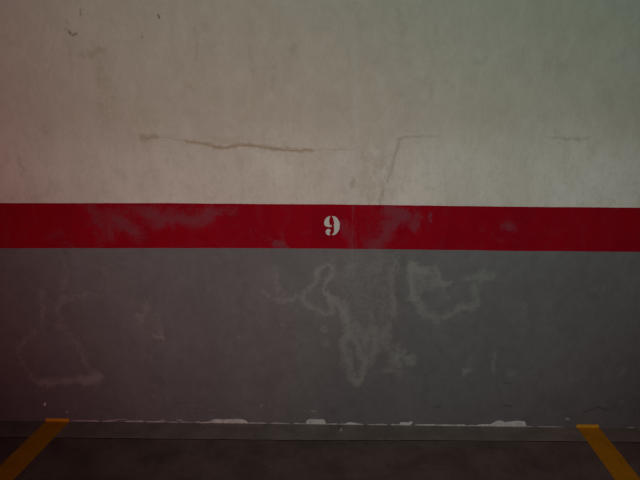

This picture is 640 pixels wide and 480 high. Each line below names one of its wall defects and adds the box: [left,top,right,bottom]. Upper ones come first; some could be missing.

crack [144,128,355,155]
crack [376,132,440,205]
leakage [257,136,501,391]
peeling [74,417,558,427]